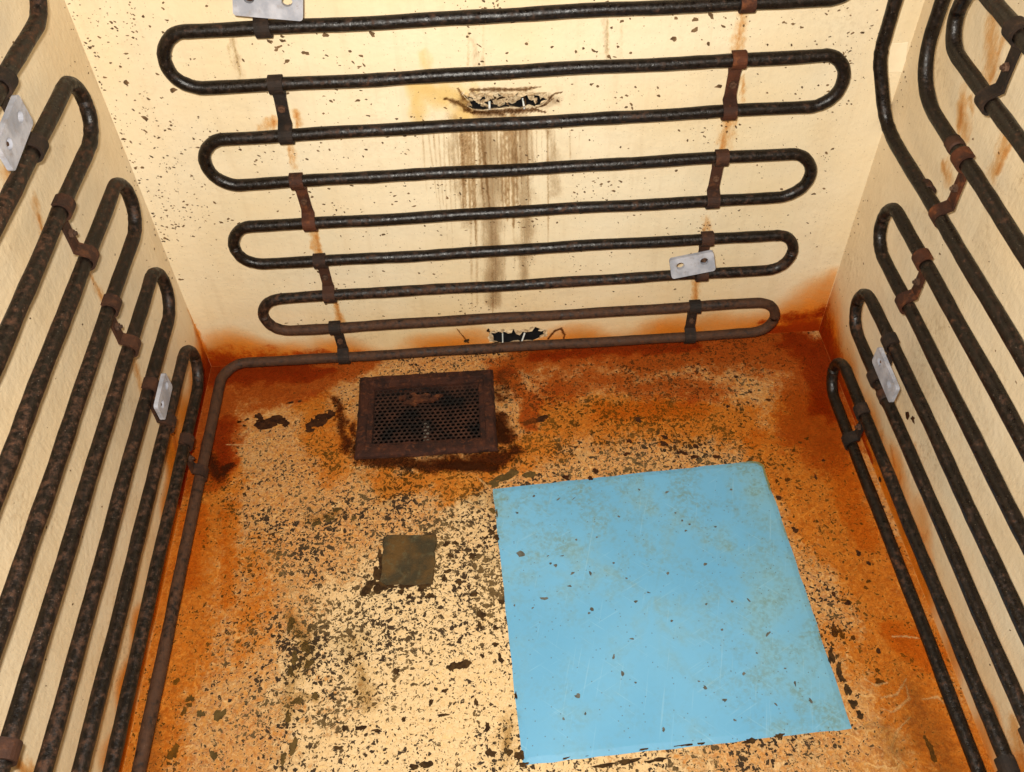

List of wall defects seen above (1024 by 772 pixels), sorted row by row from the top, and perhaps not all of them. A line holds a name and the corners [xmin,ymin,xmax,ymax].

peeling [68,2,176,91]
peeling [691,12,751,46]
spalling [434,78,585,119]
peeling [111,80,240,280]
rust [209,423,238,478]
rust [190,356,333,455]
rust [333,372,520,474]
spalling [487,327,565,343]
rust [762,318,855,417]